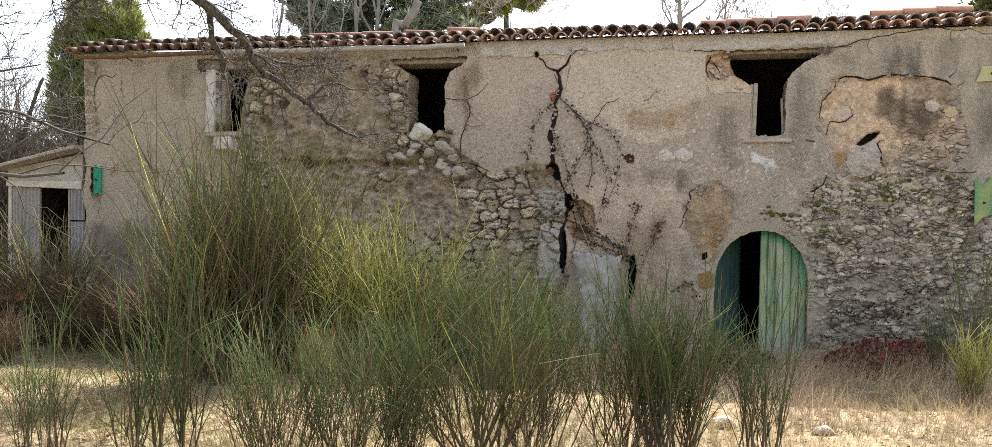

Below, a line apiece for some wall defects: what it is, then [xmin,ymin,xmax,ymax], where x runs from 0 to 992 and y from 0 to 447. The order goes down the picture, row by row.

crack [539,50,578,273]
flaking render [706,52,752,94]
flaking render [817,72,970,169]
flaking render [685,184,732,264]